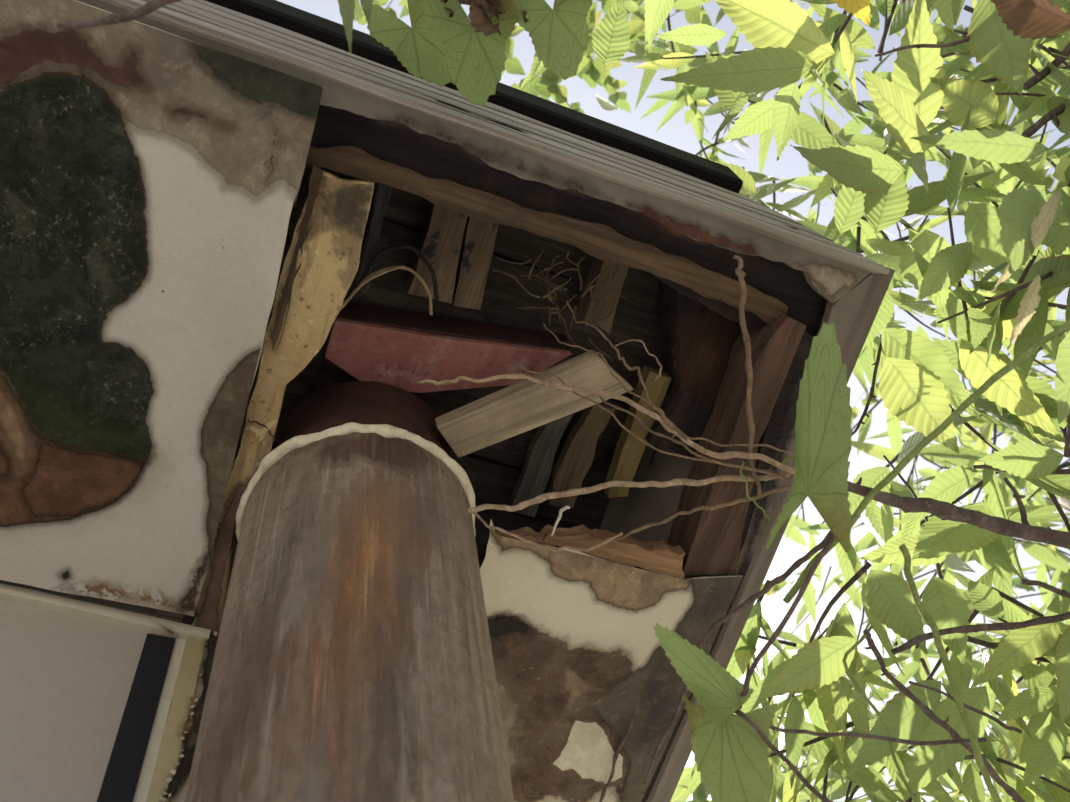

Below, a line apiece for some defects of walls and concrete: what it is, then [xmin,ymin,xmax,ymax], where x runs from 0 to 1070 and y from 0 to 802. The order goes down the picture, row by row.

water stain [0,0,323,527]
corrosion [628,204,756,255]